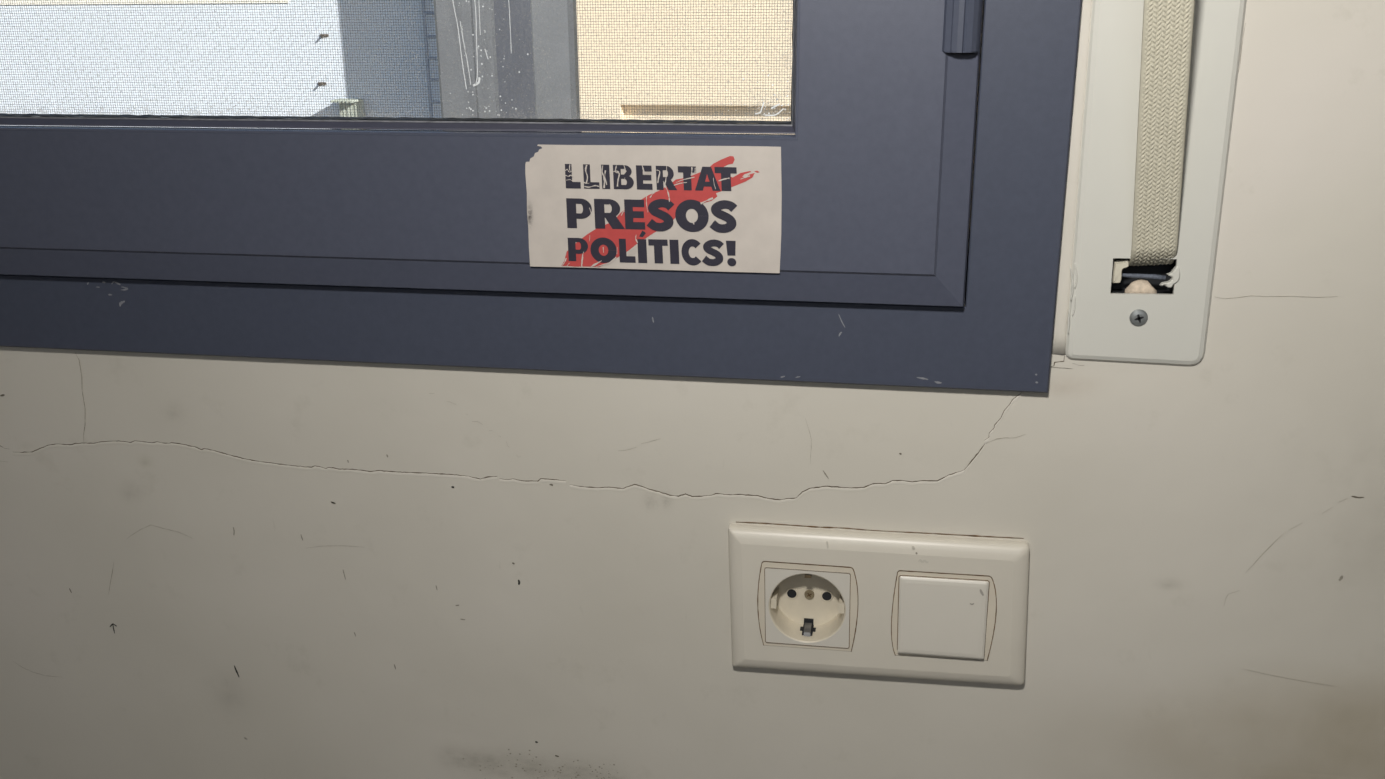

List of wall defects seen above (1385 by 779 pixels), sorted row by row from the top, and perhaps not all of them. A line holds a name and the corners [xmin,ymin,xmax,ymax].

crack [1,358,1023,504]